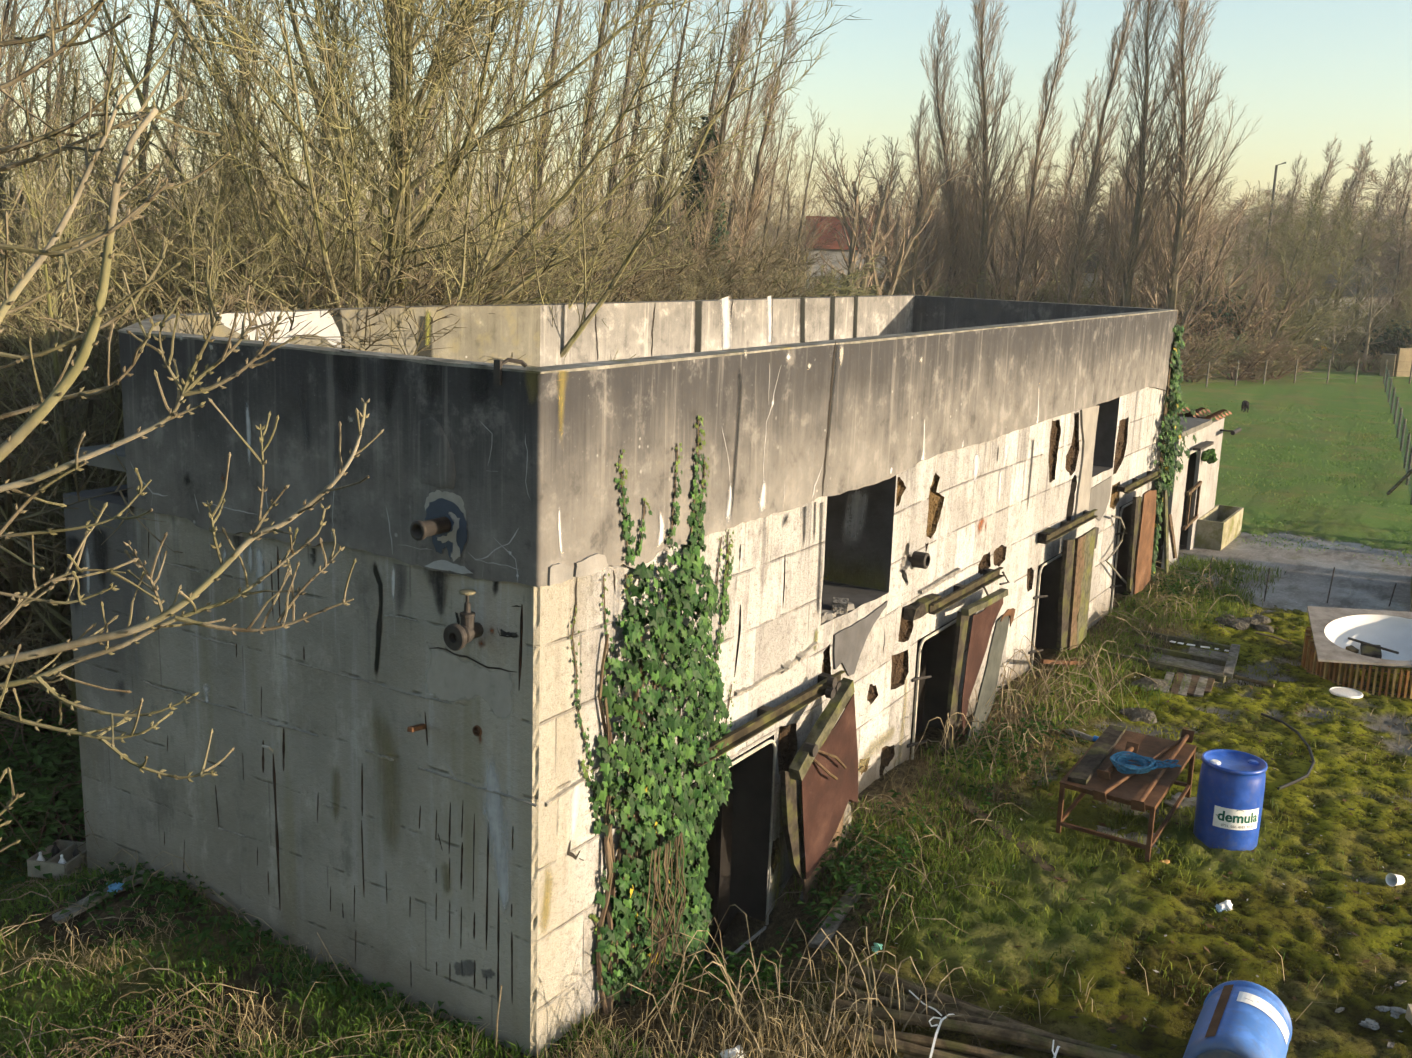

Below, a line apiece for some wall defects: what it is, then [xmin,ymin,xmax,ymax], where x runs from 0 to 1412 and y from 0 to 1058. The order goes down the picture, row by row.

spalling [894,477,906,507]
spalling [900,473,944,585]
spalling [1048,412,1079,482]
spalling [1110,417,1129,509]
spalling [867,603,913,704]